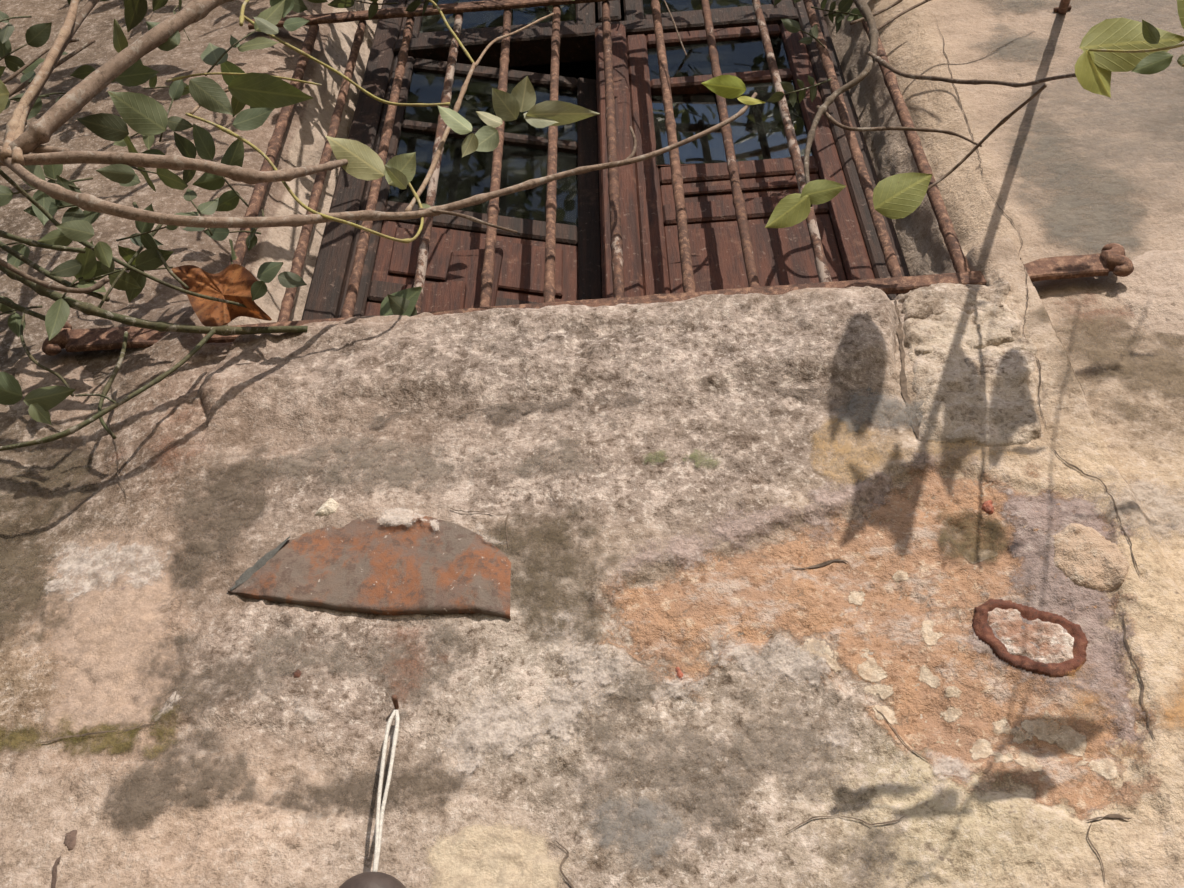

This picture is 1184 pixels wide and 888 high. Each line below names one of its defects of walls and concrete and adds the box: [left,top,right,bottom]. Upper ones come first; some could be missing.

crack [935,17,1144,581]
crack [1123,609,1157,741]